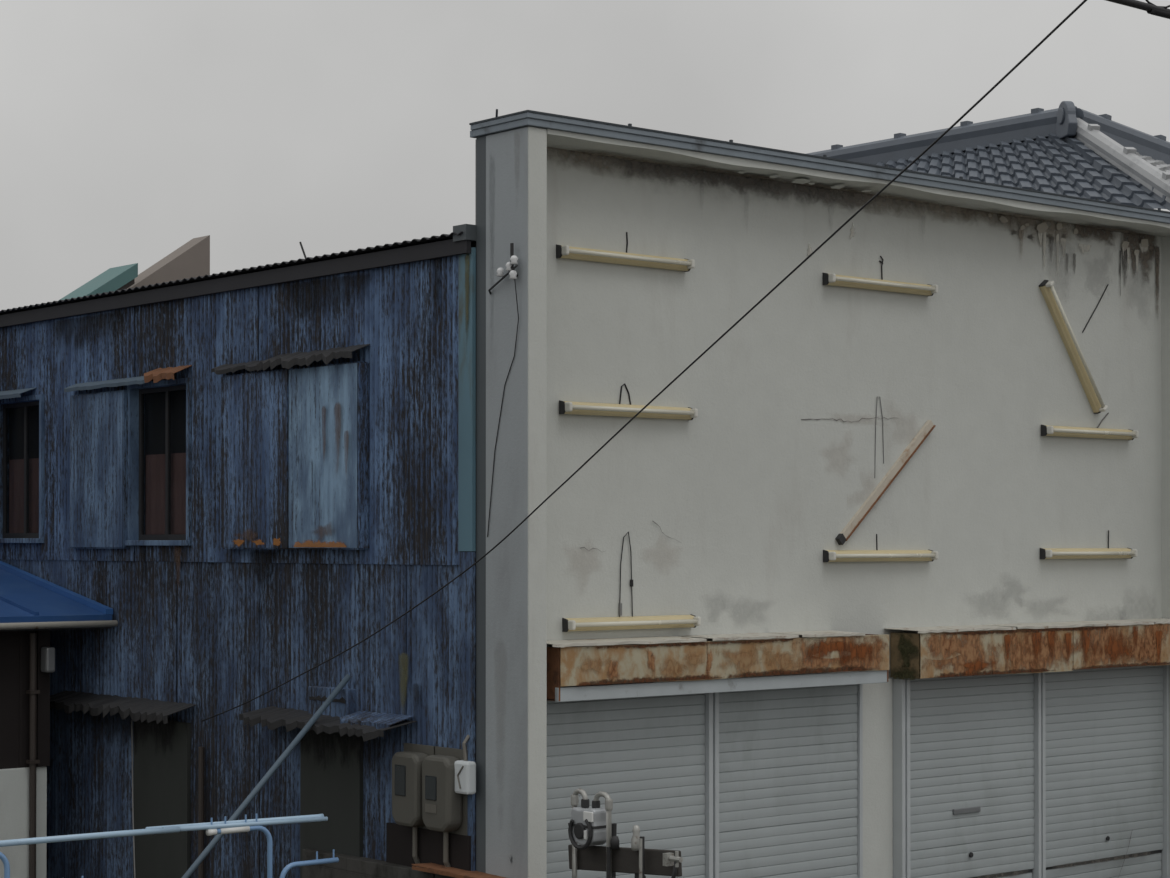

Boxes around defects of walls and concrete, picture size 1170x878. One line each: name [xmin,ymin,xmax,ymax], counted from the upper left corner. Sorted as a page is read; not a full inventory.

water stain [547,147,1160,310]
corrosion [322,403,348,468]
corrosion [233,526,346,583]
corrosion [578,636,886,686]
corrosion [922,624,1170,678]